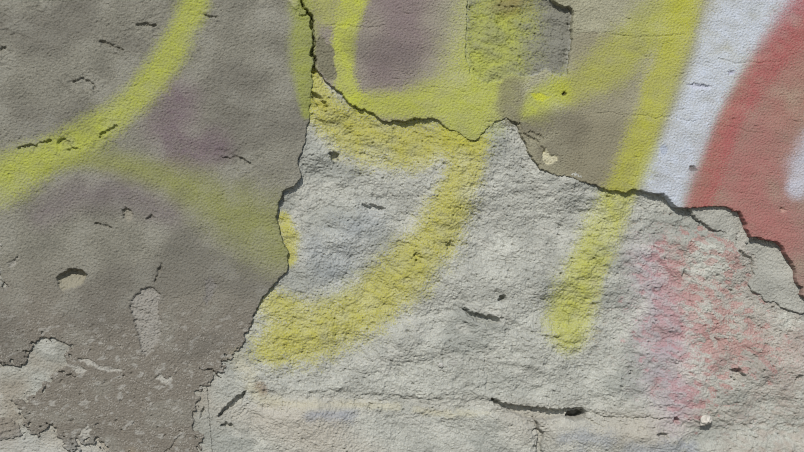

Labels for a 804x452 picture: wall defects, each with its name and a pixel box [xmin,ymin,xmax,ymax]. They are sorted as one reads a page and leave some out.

crack [300,0,317,74]
spalling [517,0,571,77]
spalling [18,138,78,151]
spalling [57,269,88,291]
spalling [130,263,163,359]
spalling [192,121,804,452]
spalling [0,331,122,451]
crack [491,398,660,452]